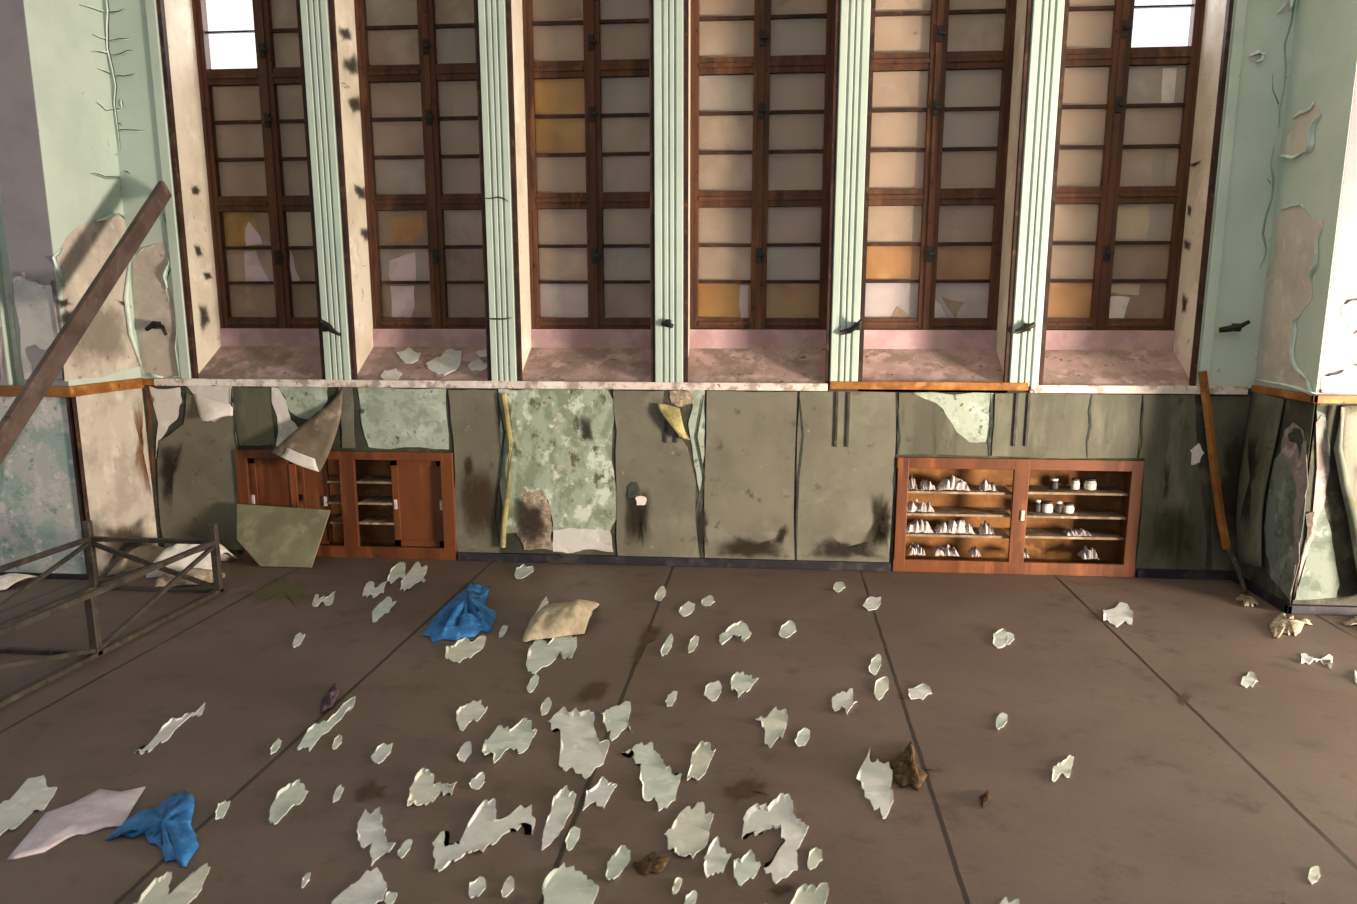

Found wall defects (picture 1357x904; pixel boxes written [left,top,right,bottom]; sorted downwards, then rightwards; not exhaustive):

peeling [1280,102,1321,159]
peeling [13,213,126,379]
peeling [55,242,234,452]
flaking render [272,387,328,446]
flaking render [914,392,993,443]
flaking render [1253,204,1357,601]
damp [464,458,494,528]
flaking render [498,389,617,553]
damp [727,528,787,556]
damp [817,501,890,557]